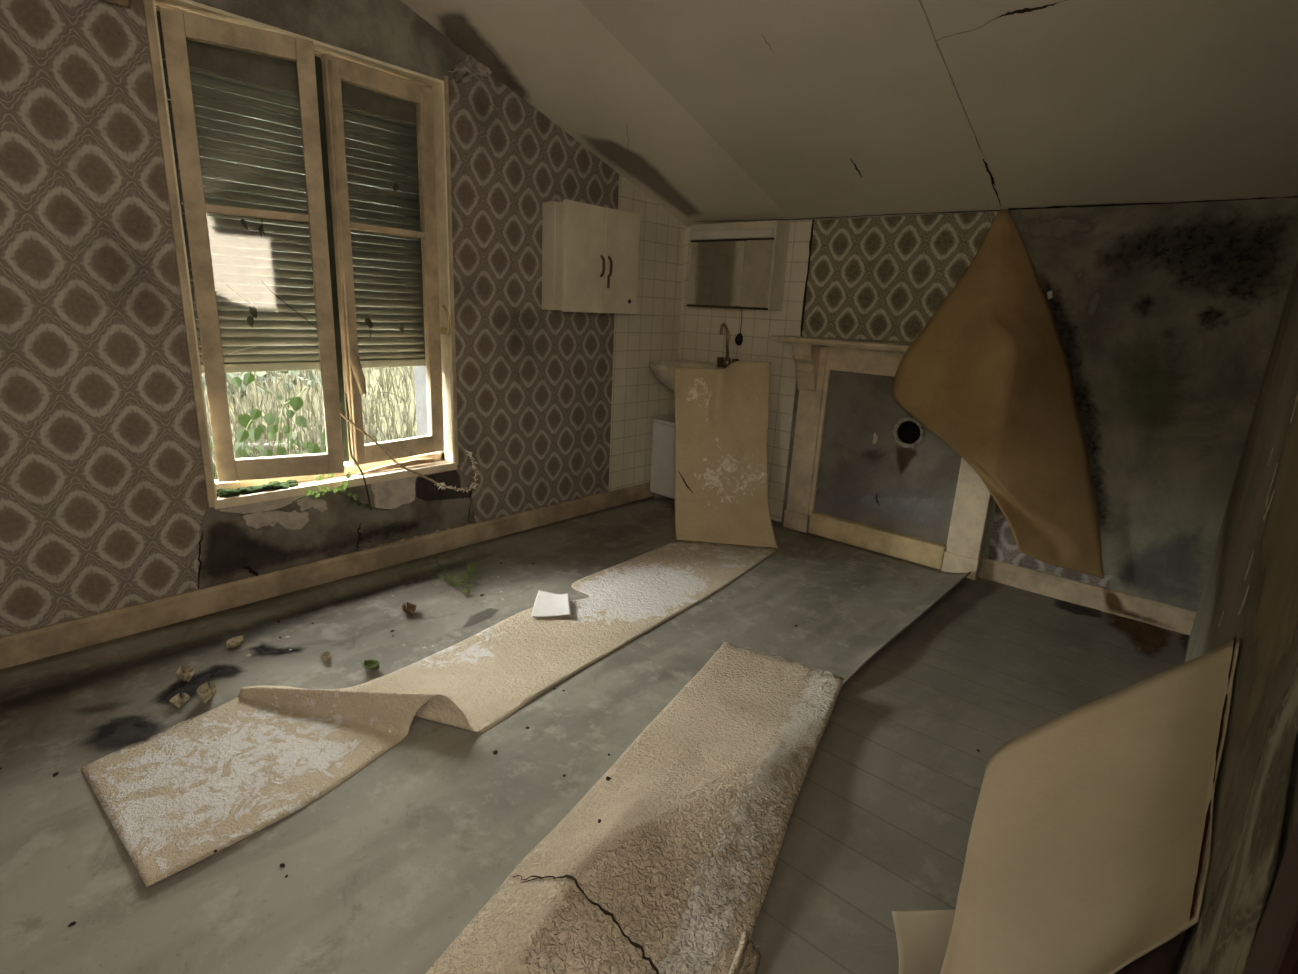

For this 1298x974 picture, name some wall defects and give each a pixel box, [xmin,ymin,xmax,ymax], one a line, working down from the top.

crack [695,0,1298,222]
leakage [1106,218,1293,300]
peeling [892,209,1104,579]
leakage [1043,281,1106,524]
flaking render [196,467,475,589]
leakage [1120,537,1196,598]
peeling [940,638,1241,974]